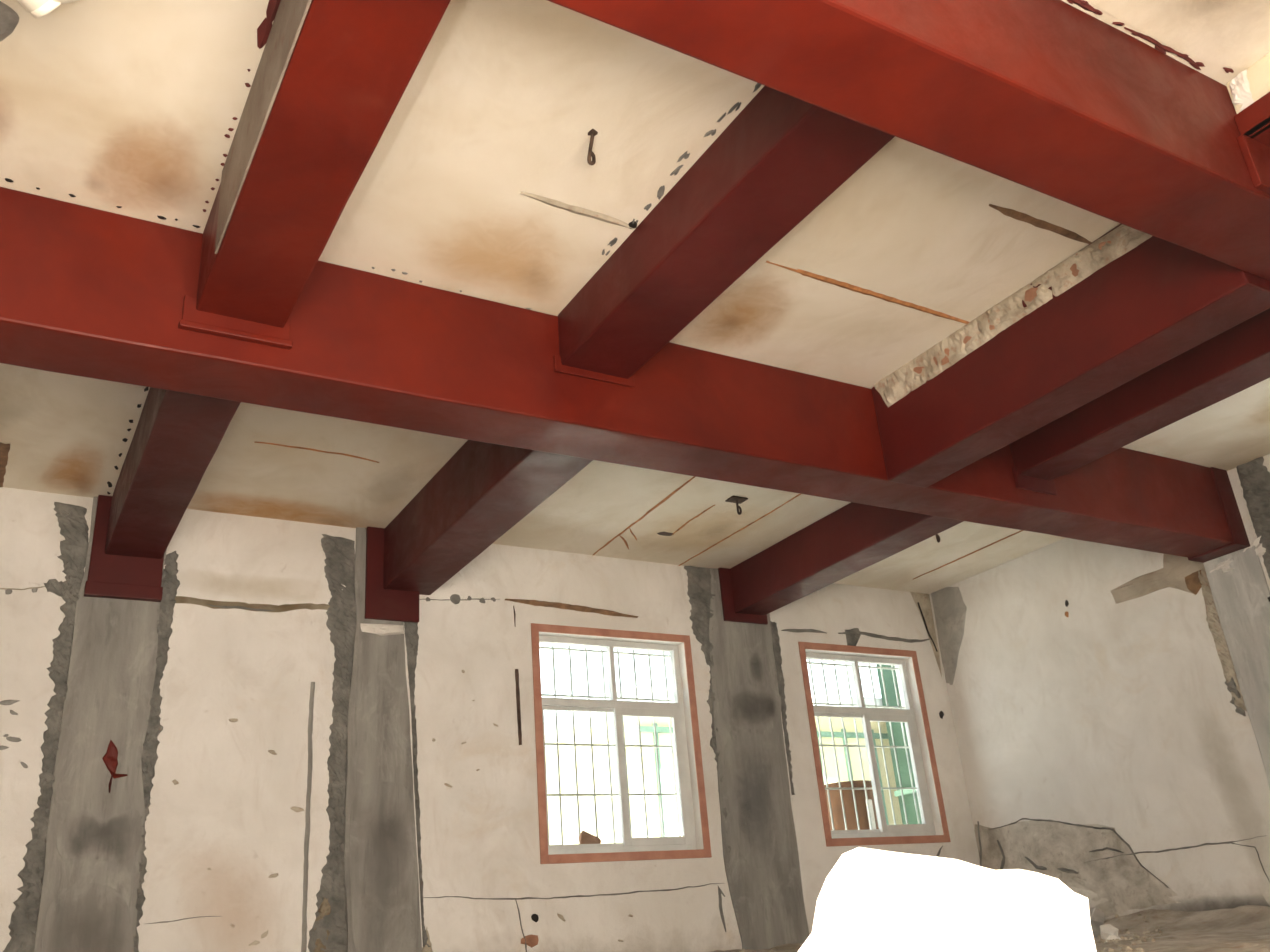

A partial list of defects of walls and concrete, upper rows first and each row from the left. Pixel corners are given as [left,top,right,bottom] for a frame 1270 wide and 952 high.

spalling [0,502,89,952]
spalling [133,551,180,952]